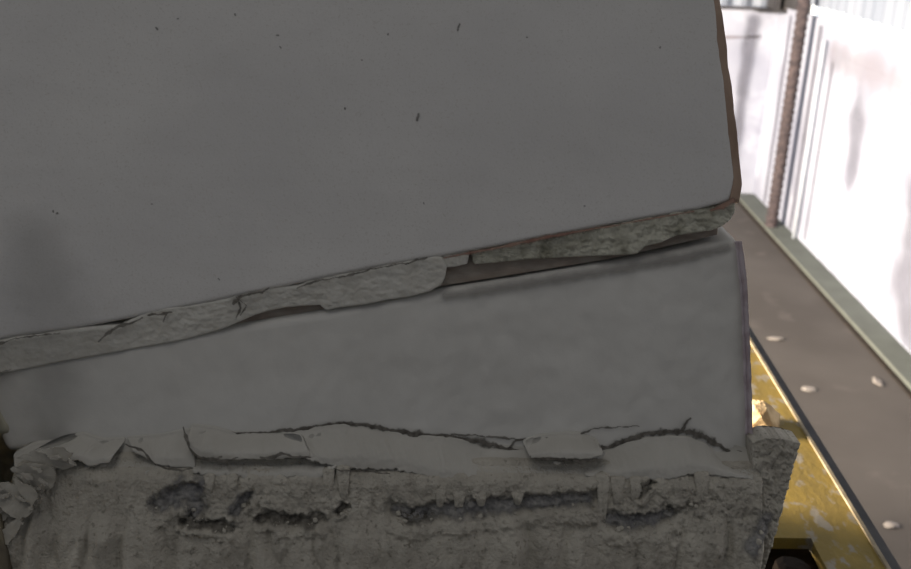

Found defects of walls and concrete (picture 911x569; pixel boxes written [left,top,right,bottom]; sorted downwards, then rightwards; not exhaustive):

crack [297,257,428,288]
crack [232,288,269,318]
crack [98,312,172,342]
crack [125,427,238,471]
crack [236,418,742,465]
peeling [0,447,77,545]
spalling [148,477,251,534]
spalling [255,511,324,530]
spalling [391,493,592,528]
spalling [605,500,706,534]